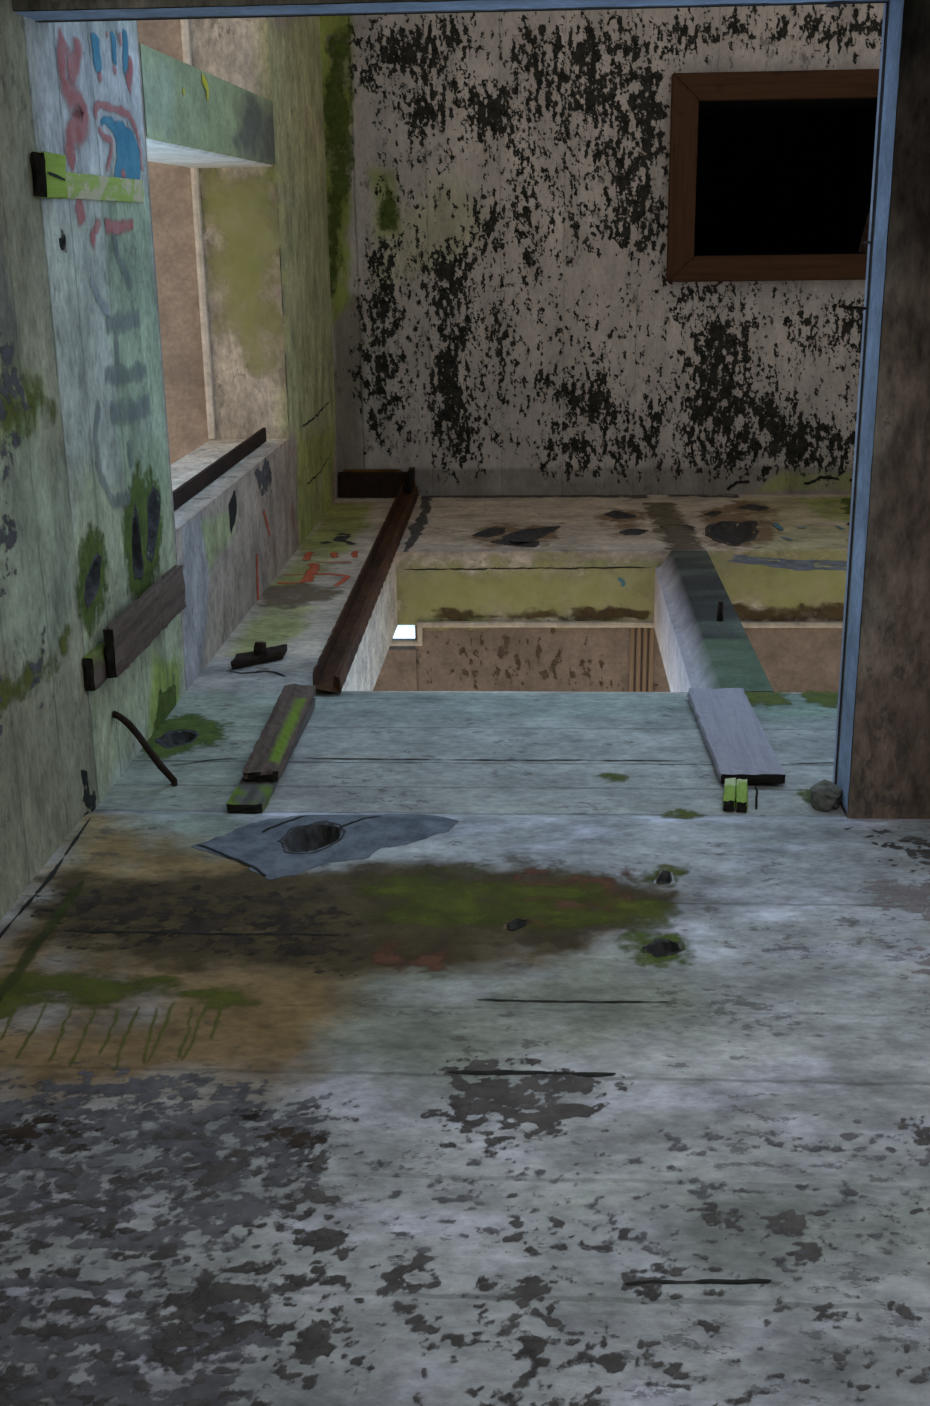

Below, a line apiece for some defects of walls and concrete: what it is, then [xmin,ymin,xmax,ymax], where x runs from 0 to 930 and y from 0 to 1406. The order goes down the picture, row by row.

peeling [0,332,37,597]
spalling [421,494,847,571]
peeling [192,814,458,880]
water stain [15,858,672,971]
water stain [99,1003,174,1070]
peeling [0,1046,930,1406]
crack [625,1278,772,1286]